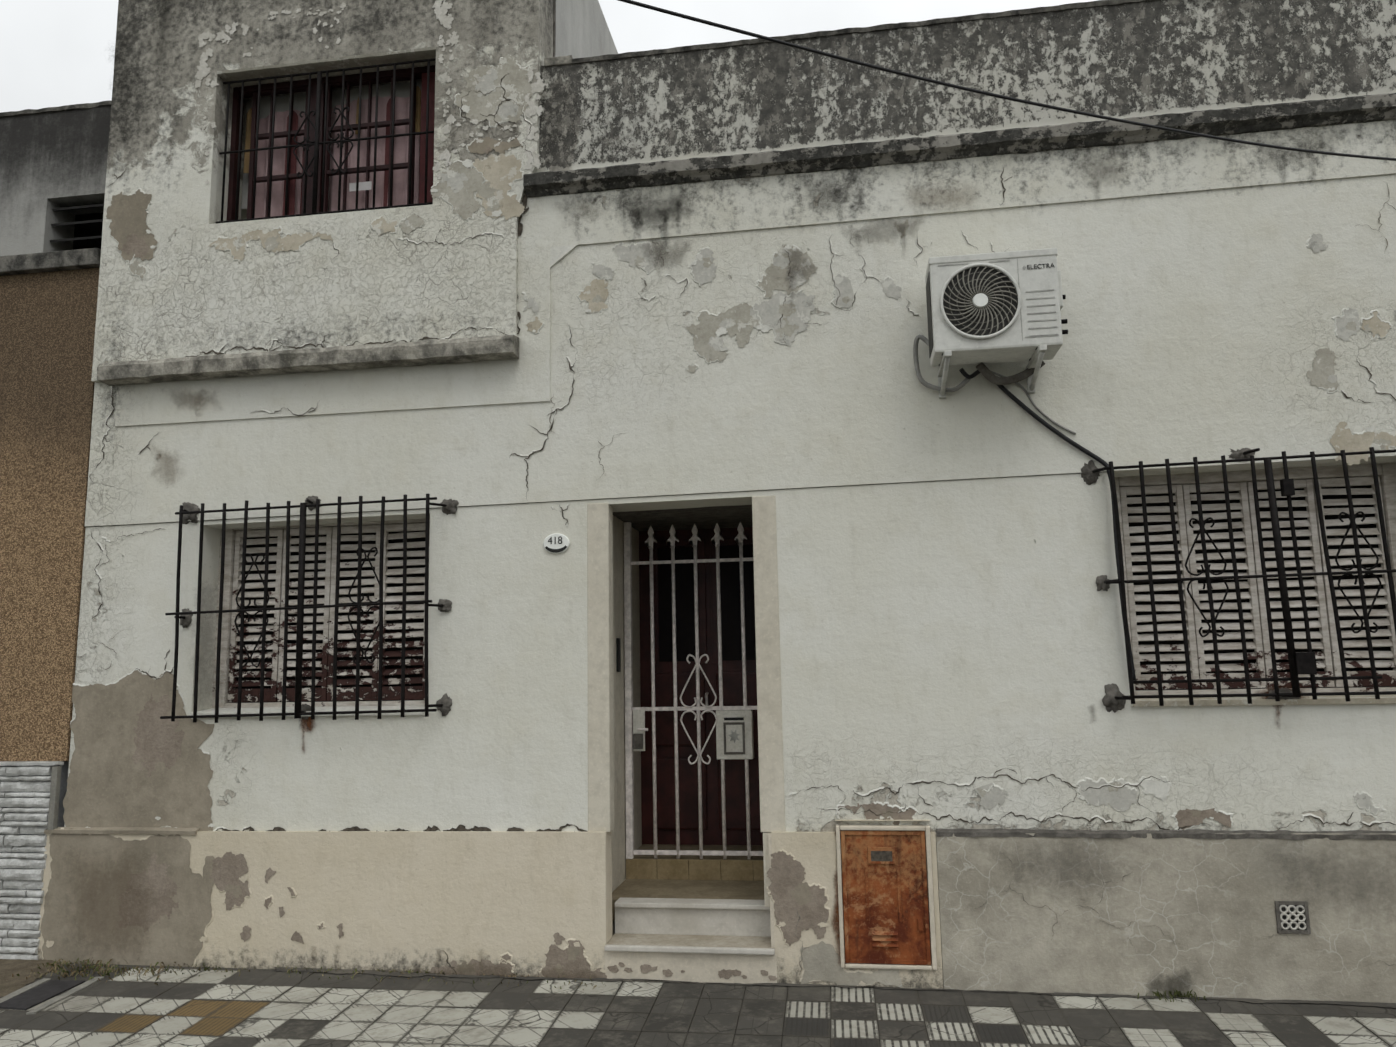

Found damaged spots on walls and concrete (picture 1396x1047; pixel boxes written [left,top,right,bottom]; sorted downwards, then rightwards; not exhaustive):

spalling [430,0,548,221]
spalling [106,188,157,281]
peeling [576,241,659,313]
peeling [682,244,854,373]
crack [1341,350,1396,403]
crack [510,327,576,526]
crack [91,528,174,680]
spalling [40,669,297,967]
peeling [835,801,918,825]
peeling [1076,775,1234,830]
spalling [766,849,831,946]
rust [832,873,845,962]